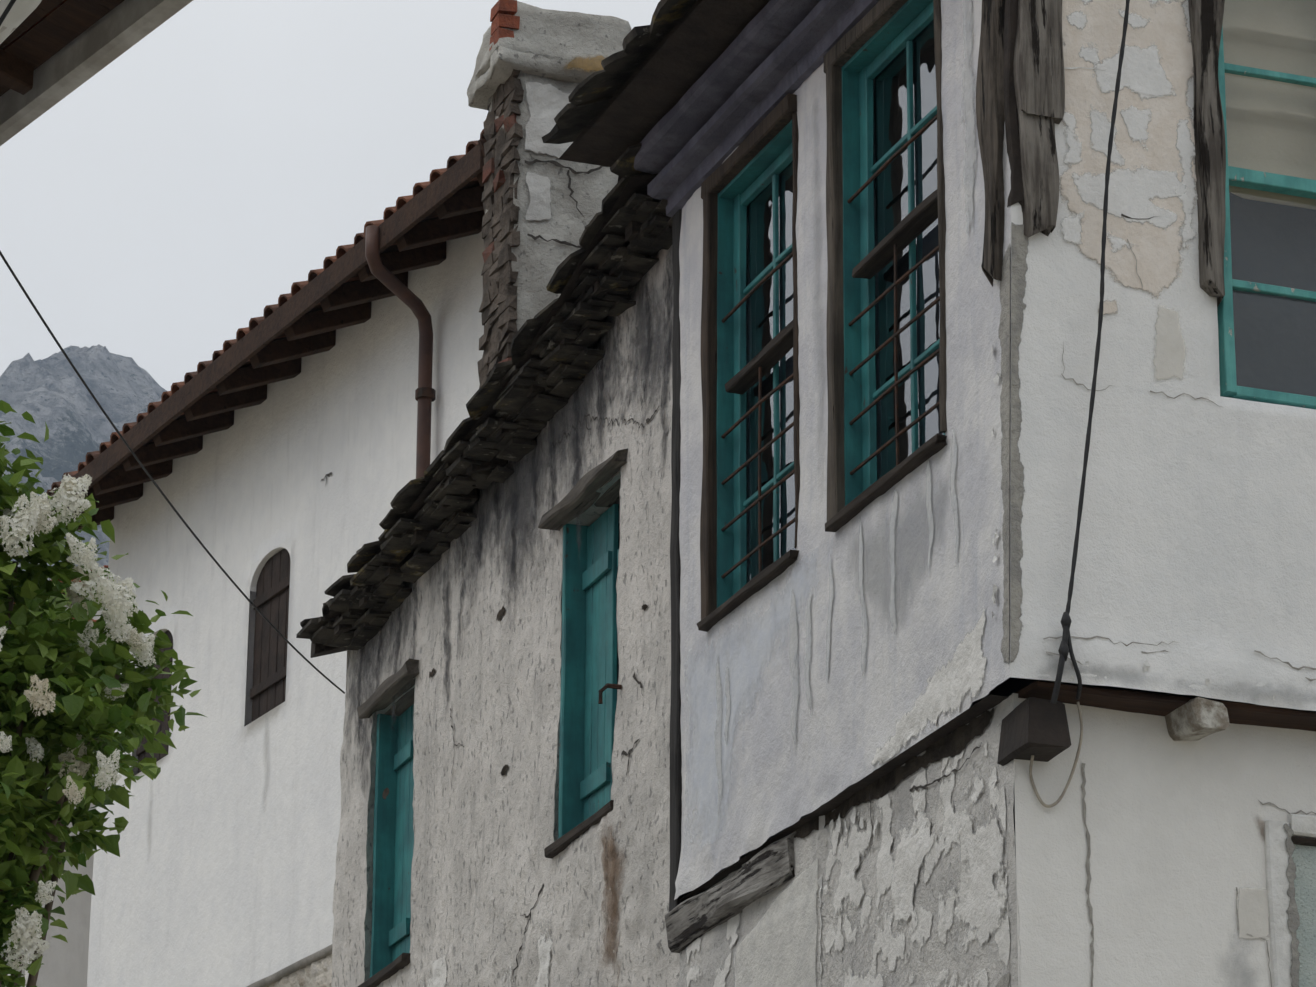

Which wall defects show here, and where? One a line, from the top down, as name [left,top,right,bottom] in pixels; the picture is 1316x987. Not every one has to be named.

leakage [351,250,673,766]
peeling [790,223,1028,987]
crack [1061,342,1116,391]
peeling [1060,0,1198,380]
crack [1150,390,1221,407]